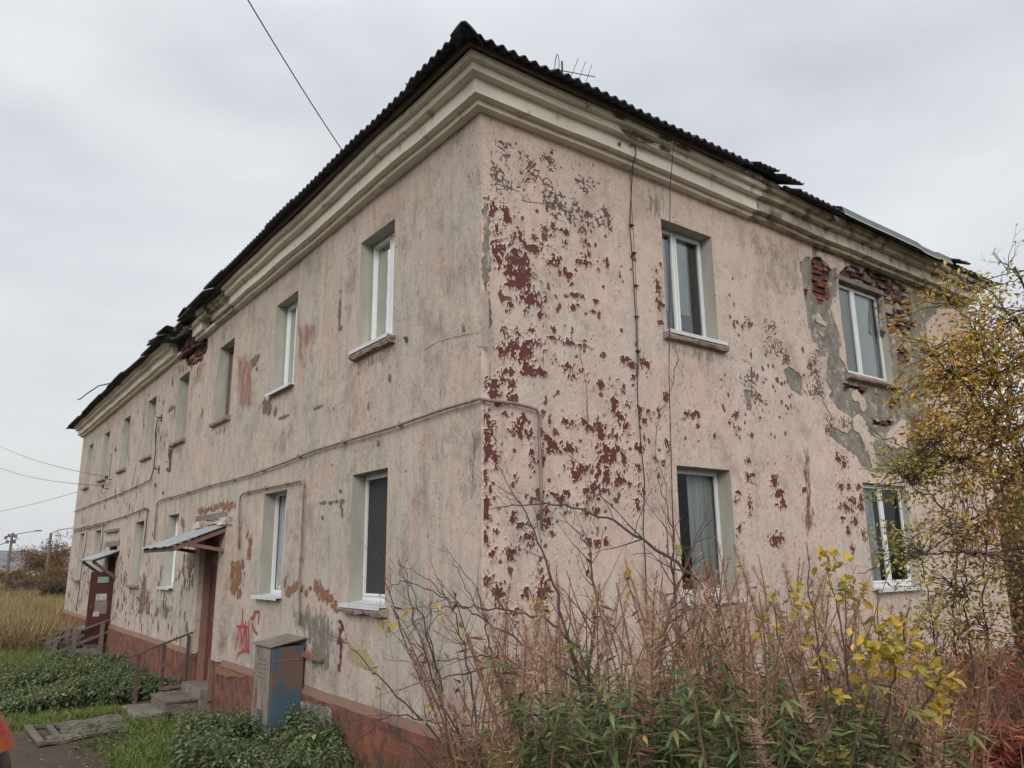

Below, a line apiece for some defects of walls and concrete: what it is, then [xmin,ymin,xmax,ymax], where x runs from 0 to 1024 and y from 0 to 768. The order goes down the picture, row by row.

spalling [176,333,208,373]
peeling [481,187,670,700]
peeling [680,404,717,442]
spalling [722,246,958,568]
peeling [198,499,236,515]
peeling [230,530,252,599]
peeling [284,577,344,672]